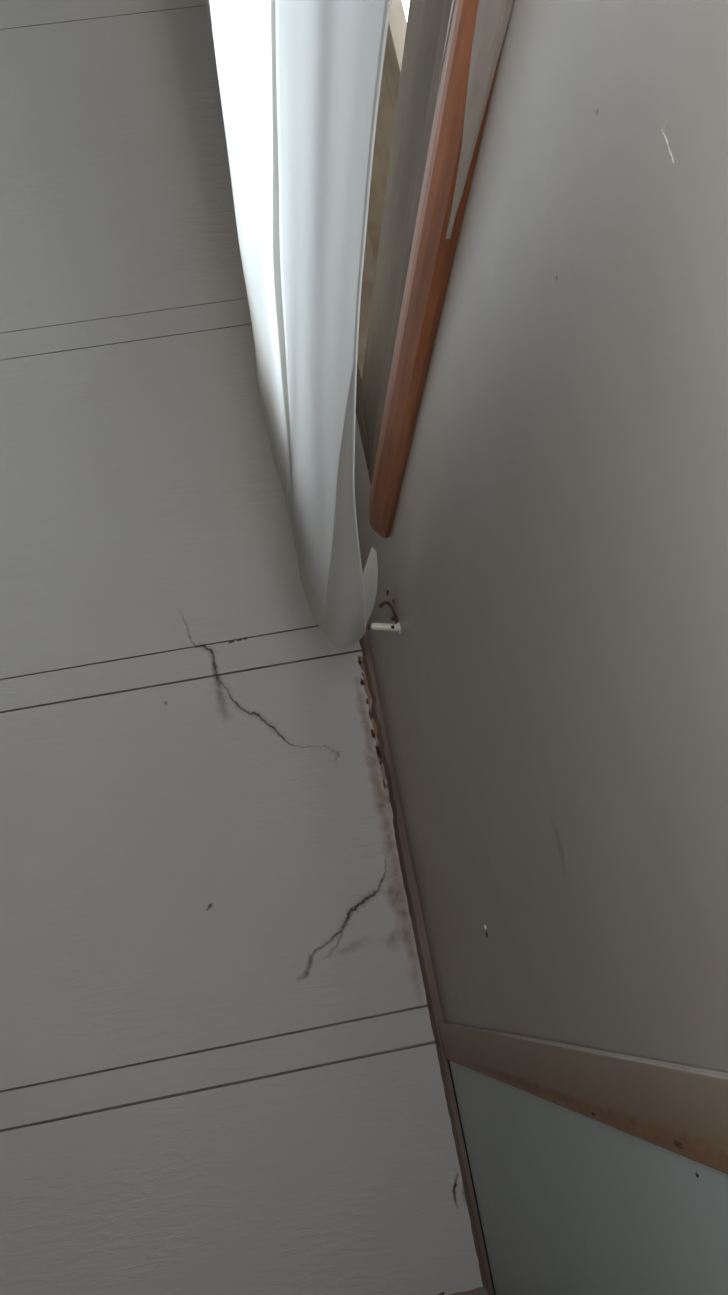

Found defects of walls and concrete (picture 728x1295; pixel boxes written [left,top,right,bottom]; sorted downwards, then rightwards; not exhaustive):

peeling [446,0,513,239]
crack [346,892,375,921]